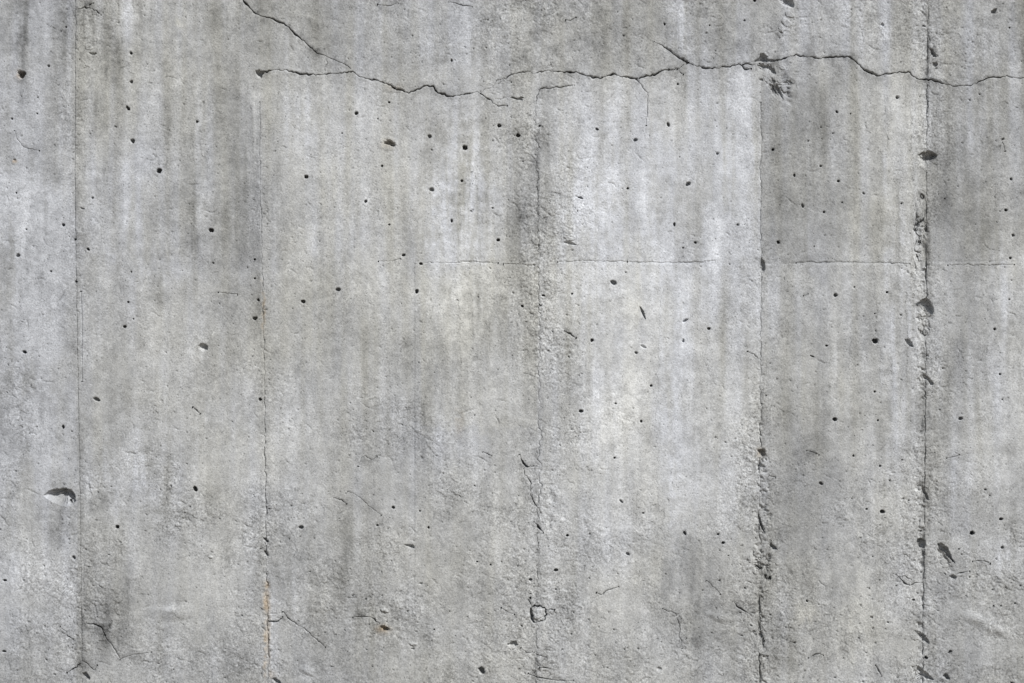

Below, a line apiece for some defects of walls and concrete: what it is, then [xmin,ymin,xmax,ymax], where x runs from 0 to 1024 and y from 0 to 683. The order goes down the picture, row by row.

crack [240,0,1024,125]
spalling [41,487,78,508]